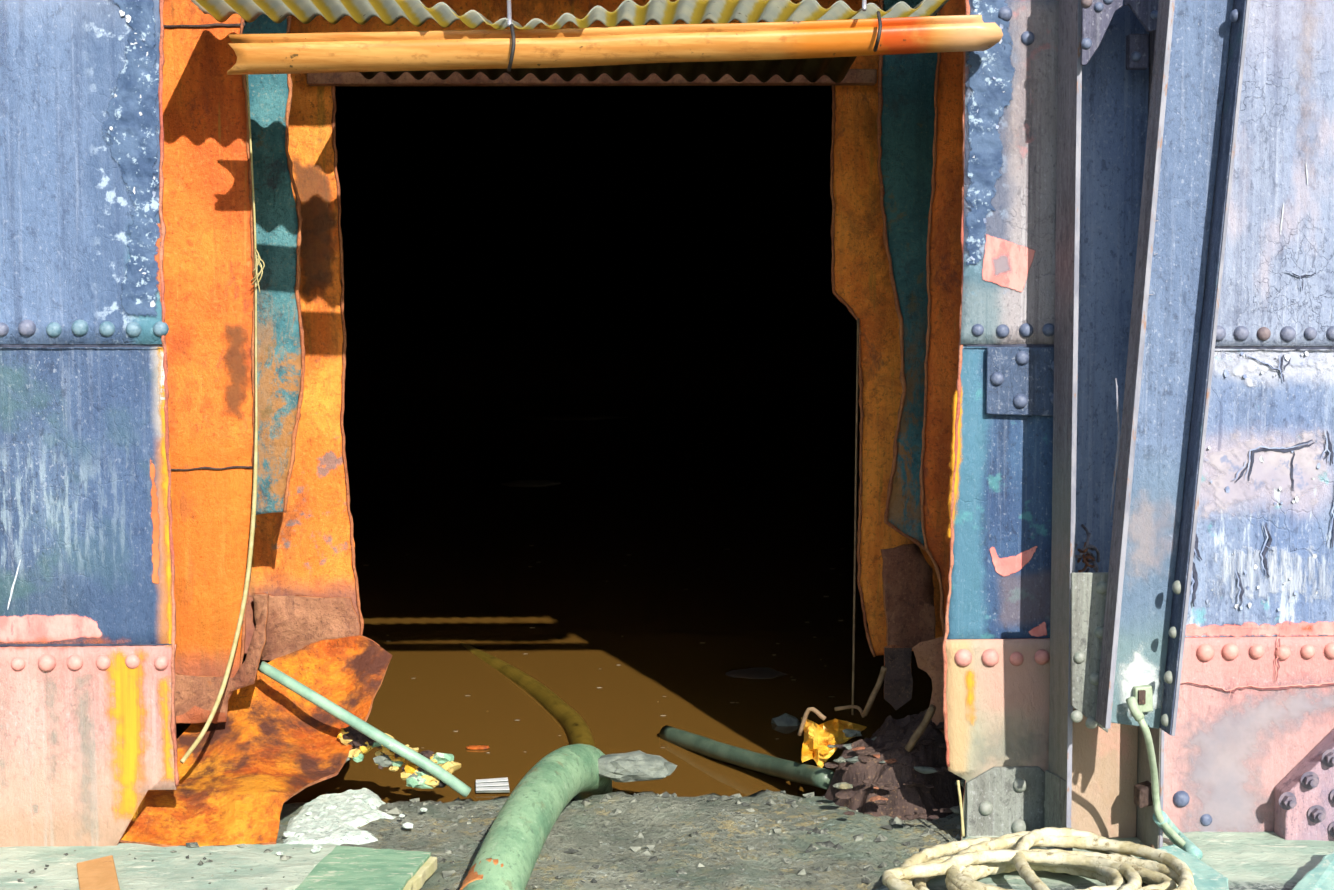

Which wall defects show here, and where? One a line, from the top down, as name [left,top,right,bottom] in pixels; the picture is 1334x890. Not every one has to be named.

rust [293,160,335,295]
rust [225,325,247,418]
rust [949,388,962,537]
crack [1233,431,1334,491]
crack [1326,506,1334,547]
rust [90,635,392,847]